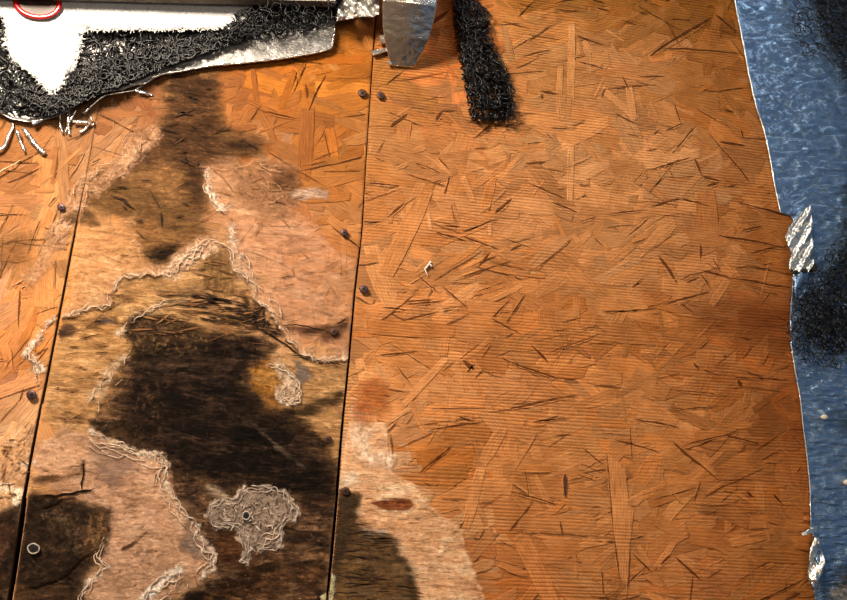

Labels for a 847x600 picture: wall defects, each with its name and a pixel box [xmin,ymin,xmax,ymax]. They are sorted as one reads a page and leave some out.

damp [0,69,485,600]